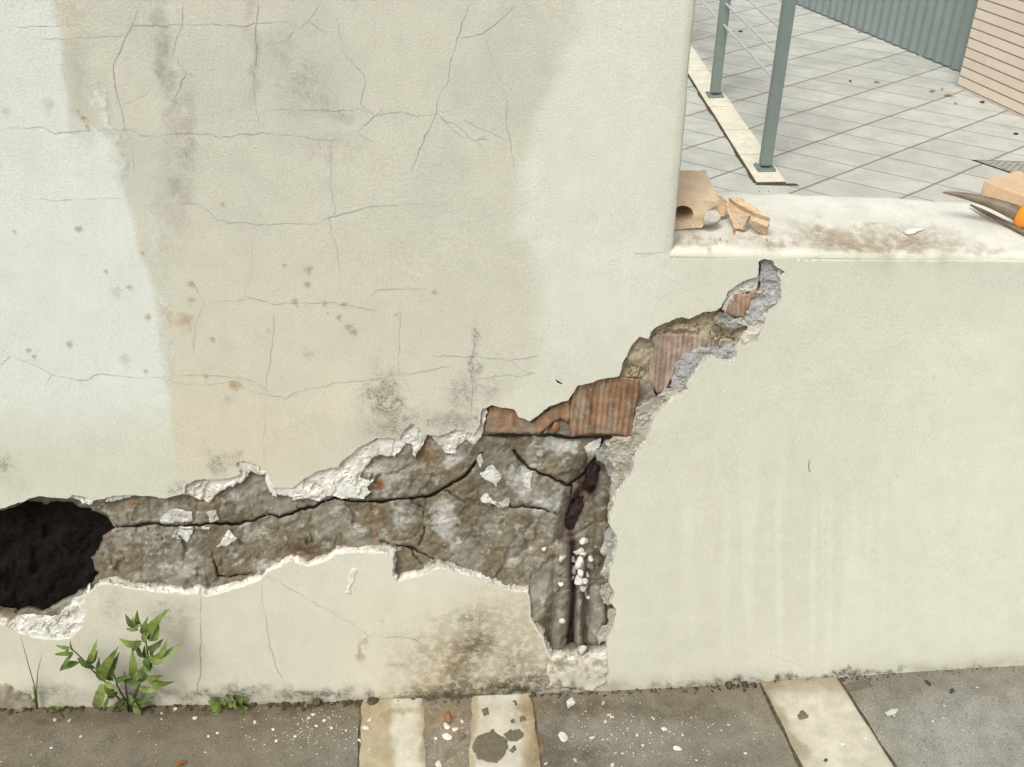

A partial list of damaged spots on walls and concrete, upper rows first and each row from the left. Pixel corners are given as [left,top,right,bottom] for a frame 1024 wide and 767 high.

crack [2,2,537,461]
spalling [0,259,785,692]
crack [482,433,613,514]
crack [194,597,202,701]
crack [213,560,437,678]
damp [416,666,547,699]